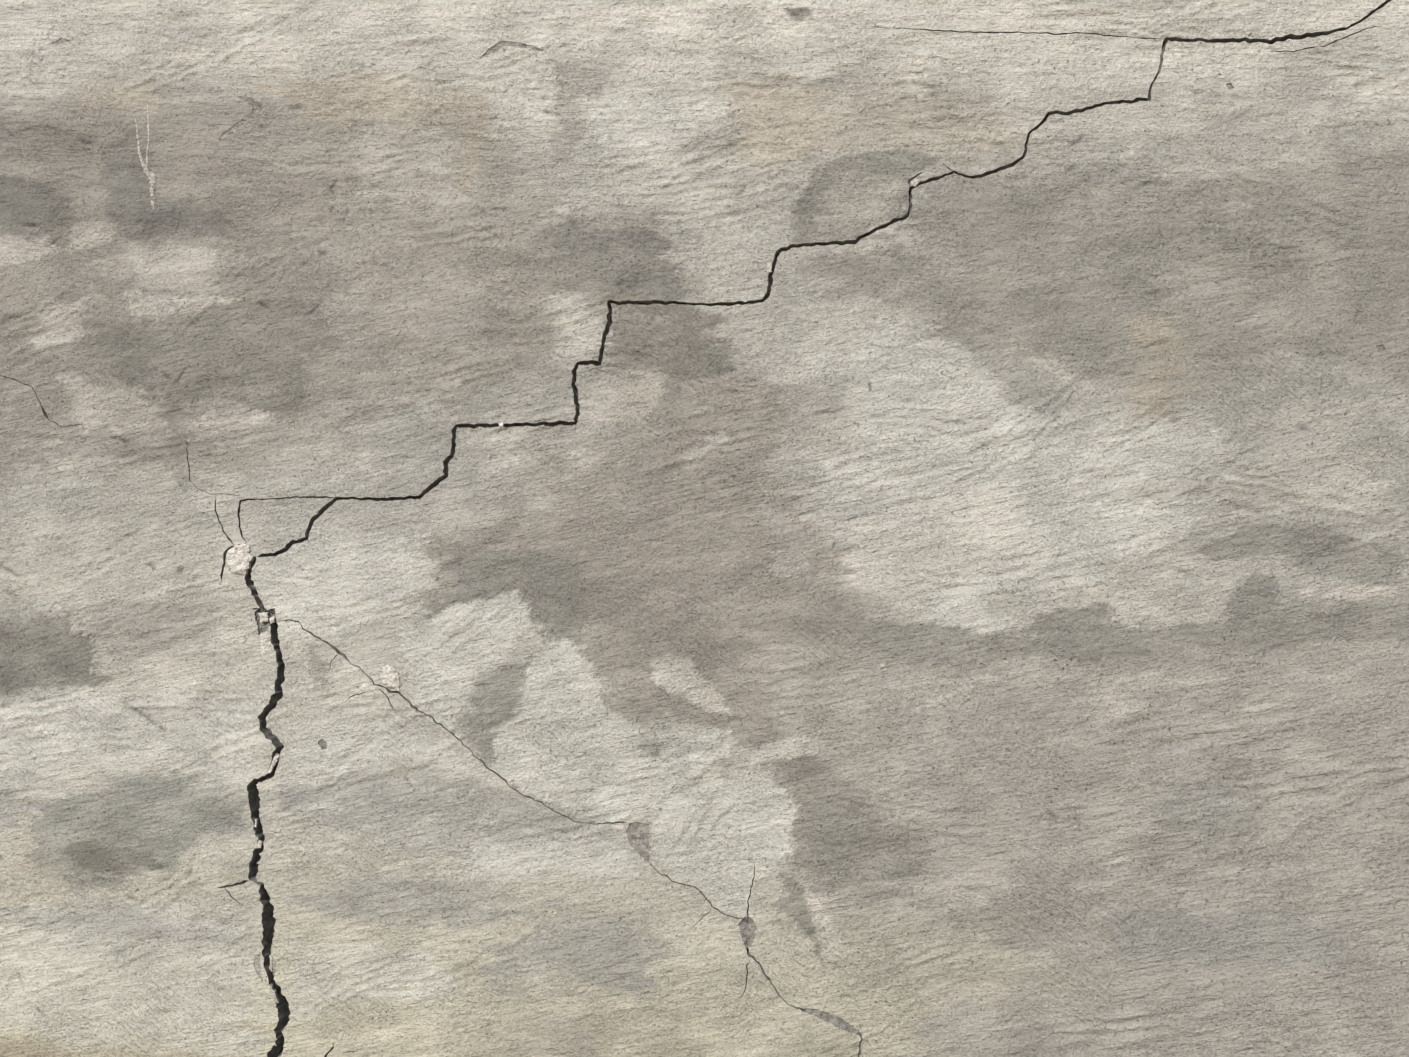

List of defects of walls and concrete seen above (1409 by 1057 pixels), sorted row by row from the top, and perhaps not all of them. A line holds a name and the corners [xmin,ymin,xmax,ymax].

water stain [0,104,241,249]
water stain [73,281,357,491]
water stain [501,197,748,428]
crack [237,0,1392,557]
water stain [753,104,1409,421]
water stain [0,594,116,709]
crack [215,499,290,1057]
crack [284,619,628,832]
crack [650,863,805,1010]
water stain [770,757,949,966]
water stain [801,514,1409,676]
crack [856,1029,864,1057]